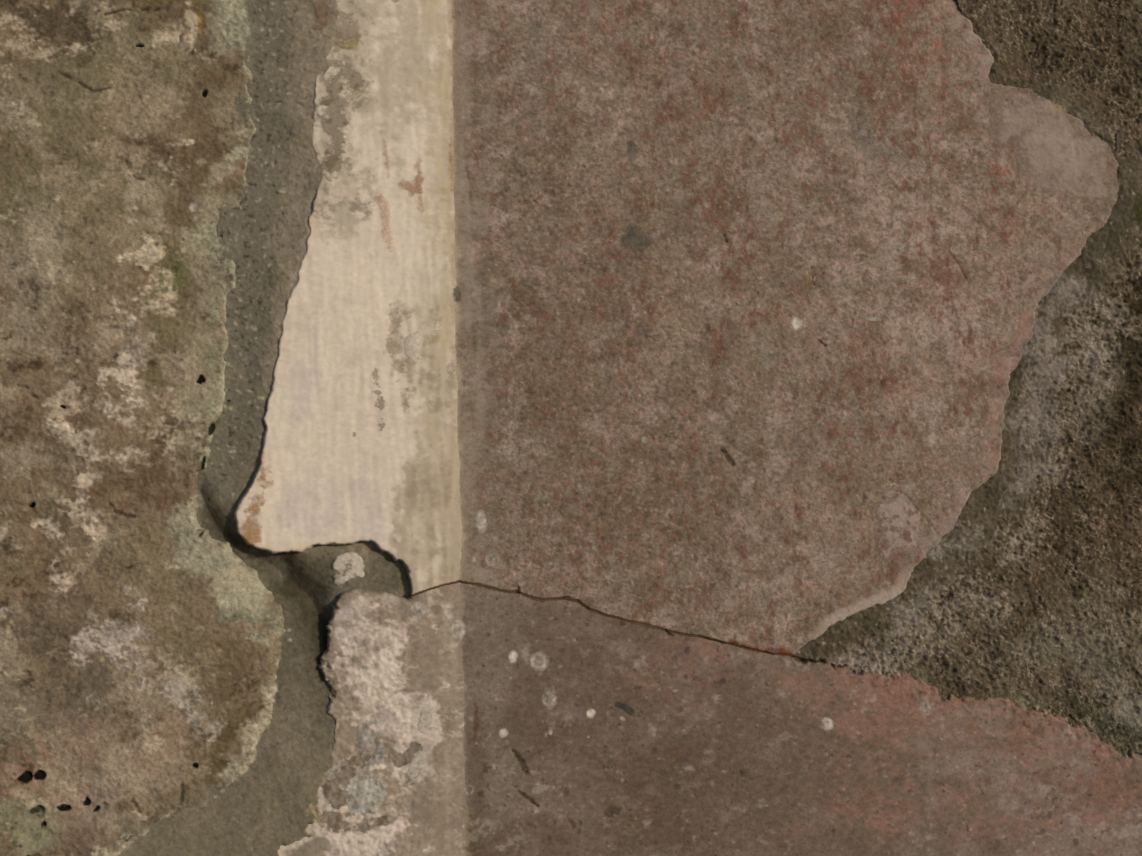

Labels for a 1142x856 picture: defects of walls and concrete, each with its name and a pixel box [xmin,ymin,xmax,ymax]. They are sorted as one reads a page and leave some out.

rust [243,476,265,546]
spalling [102,0,433,856]
crack [410,580,825,662]
spalling [794,0,1142,756]